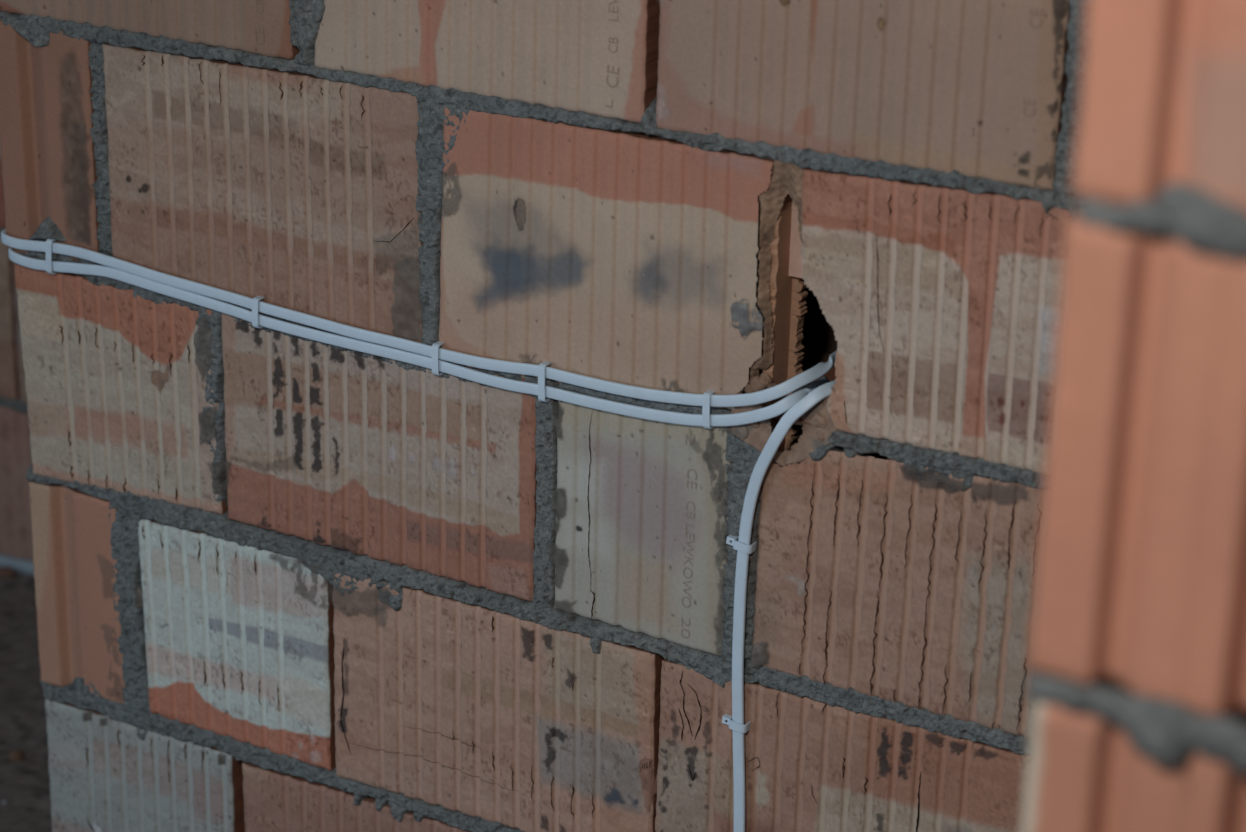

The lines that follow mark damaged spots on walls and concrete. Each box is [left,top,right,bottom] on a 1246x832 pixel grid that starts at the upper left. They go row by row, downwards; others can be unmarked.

spalling [729,160,838,467]
crack [587,411,595,618]
crack [679,672,702,781]